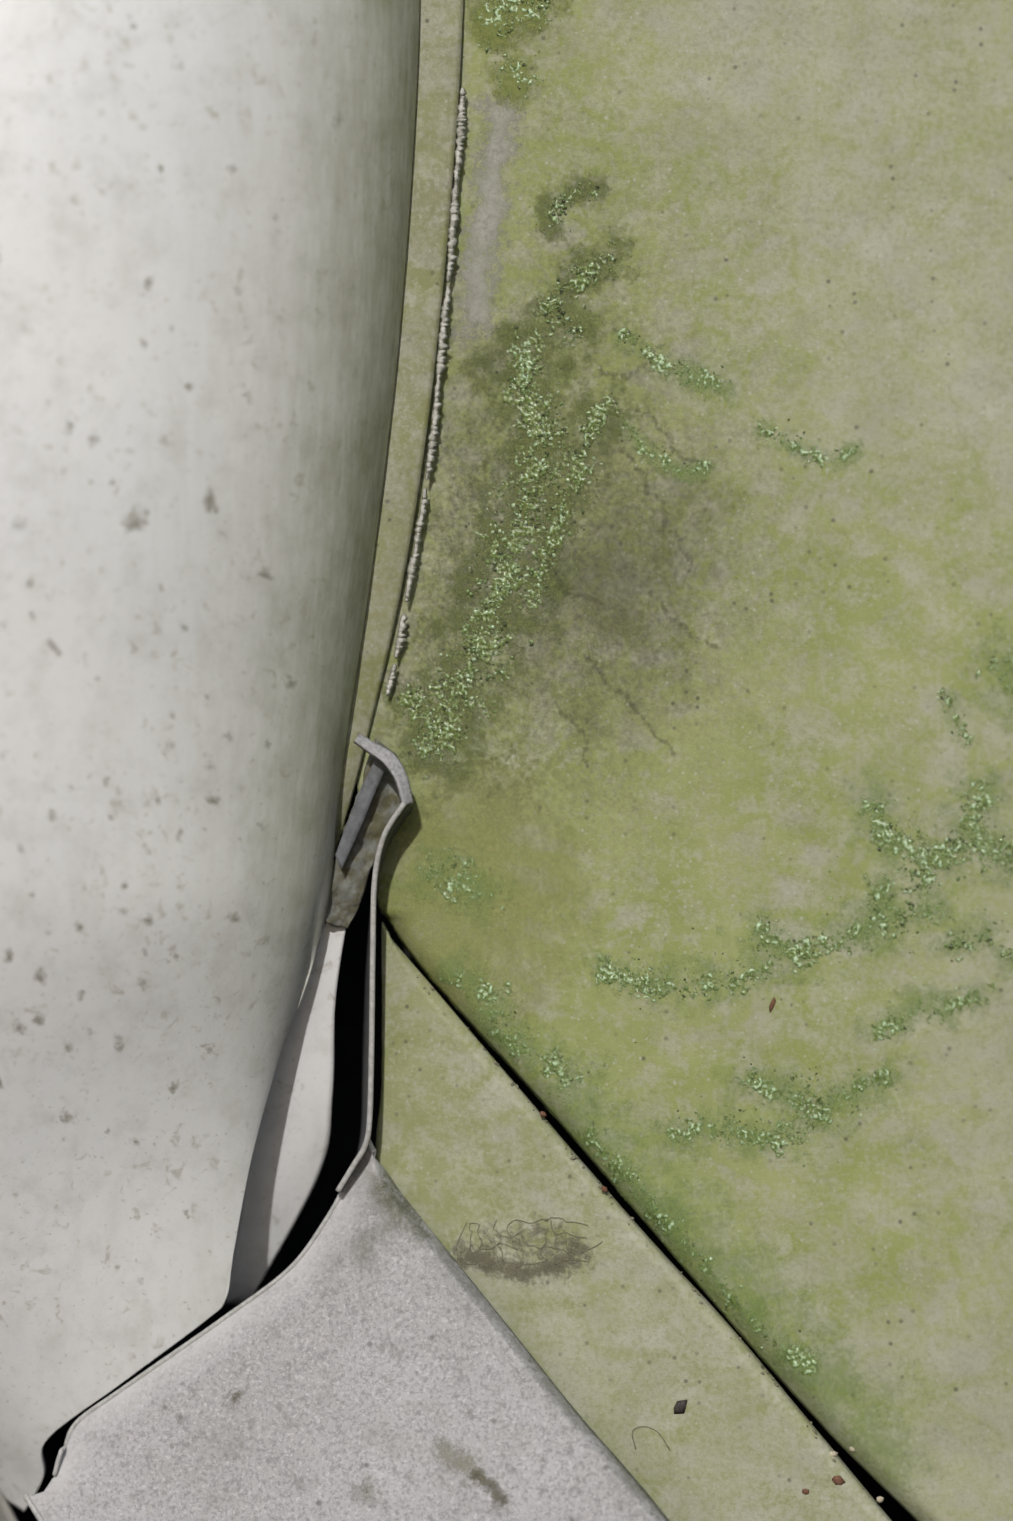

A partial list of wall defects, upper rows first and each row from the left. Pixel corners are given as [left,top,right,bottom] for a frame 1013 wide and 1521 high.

leakage [451,95,522,339]